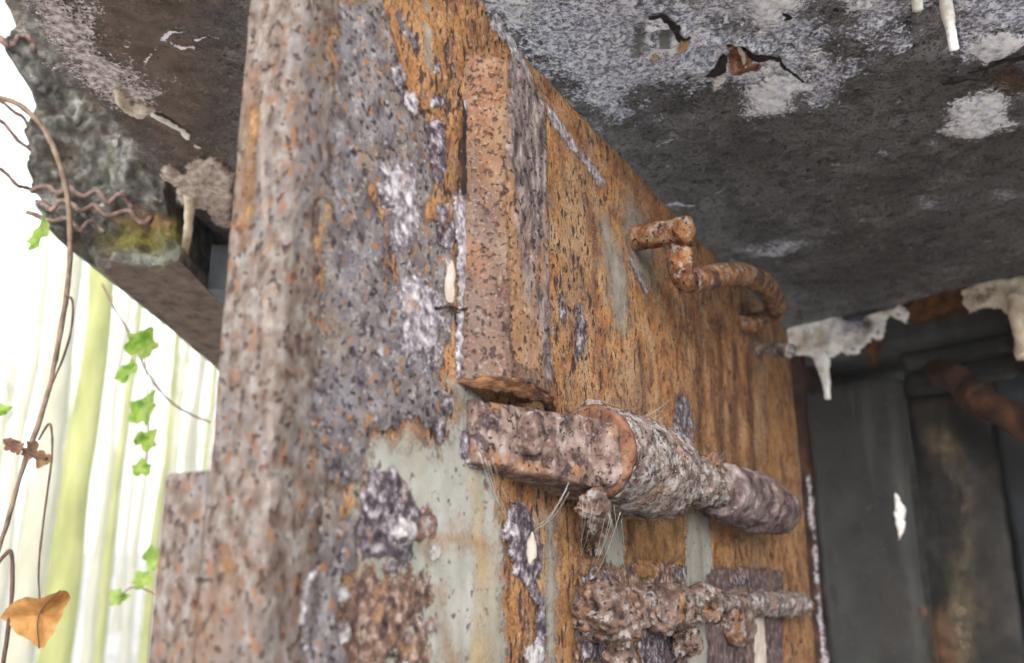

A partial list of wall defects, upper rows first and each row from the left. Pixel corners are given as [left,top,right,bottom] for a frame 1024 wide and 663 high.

corrosion [387,0,490,119]
spalling [631,0,697,61]
water stain [477,0,1024,136]
water stain [927,82,1023,149]
corrosion [367,182,400,284]
corrosion [424,180,453,232]
water stain [961,275,1024,314]
water stain [787,304,909,359]
corrosion [625,513,686,567]
corrosion [498,498,533,663]
corrosion [553,500,589,663]